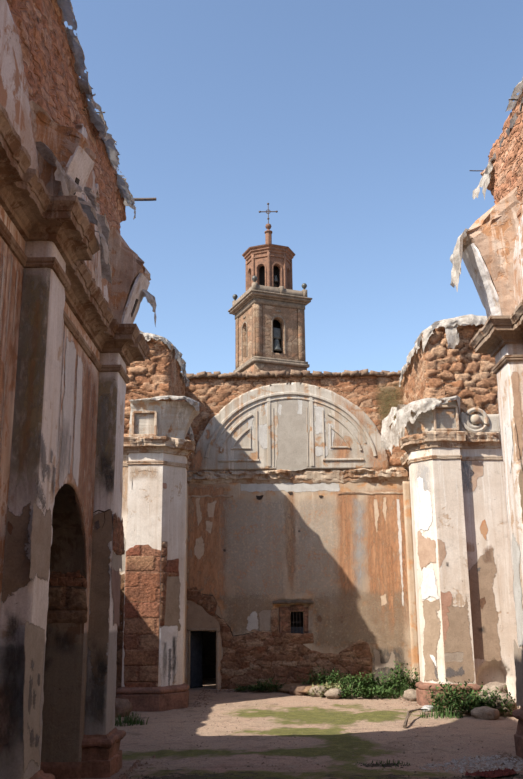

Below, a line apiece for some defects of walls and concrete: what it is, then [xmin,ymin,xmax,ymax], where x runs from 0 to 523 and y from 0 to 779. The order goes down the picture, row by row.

peeling [56,329,83,489]
flaking render [1,490,372,773]
leakage [314,592,404,682]
peeling [374,497,387,532]
peeling [396,499,404,606]
flaking render [417,477,502,683]
flaking render [505,372,523,521]
peeling [512,534,523,707]